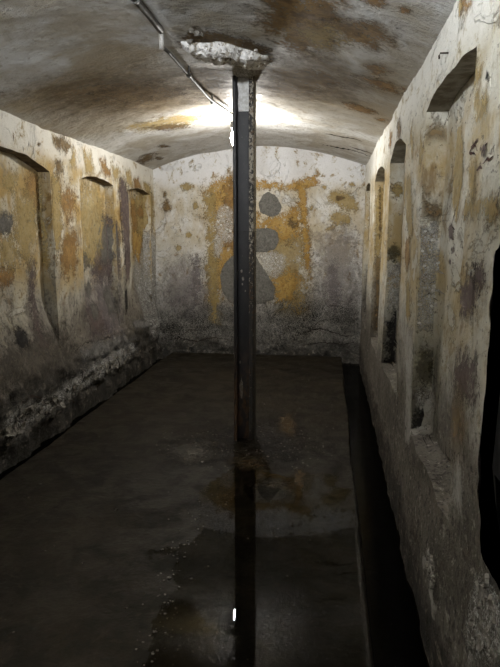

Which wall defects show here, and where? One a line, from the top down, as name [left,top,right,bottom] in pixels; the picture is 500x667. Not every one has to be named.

flaking render [177,26,276,79]
water stain [256,57,364,97]
water stain [0,258,77,390]
flaking render [3,314,154,446]
water stain [133,231,234,352]
water stain [459,258,486,321]